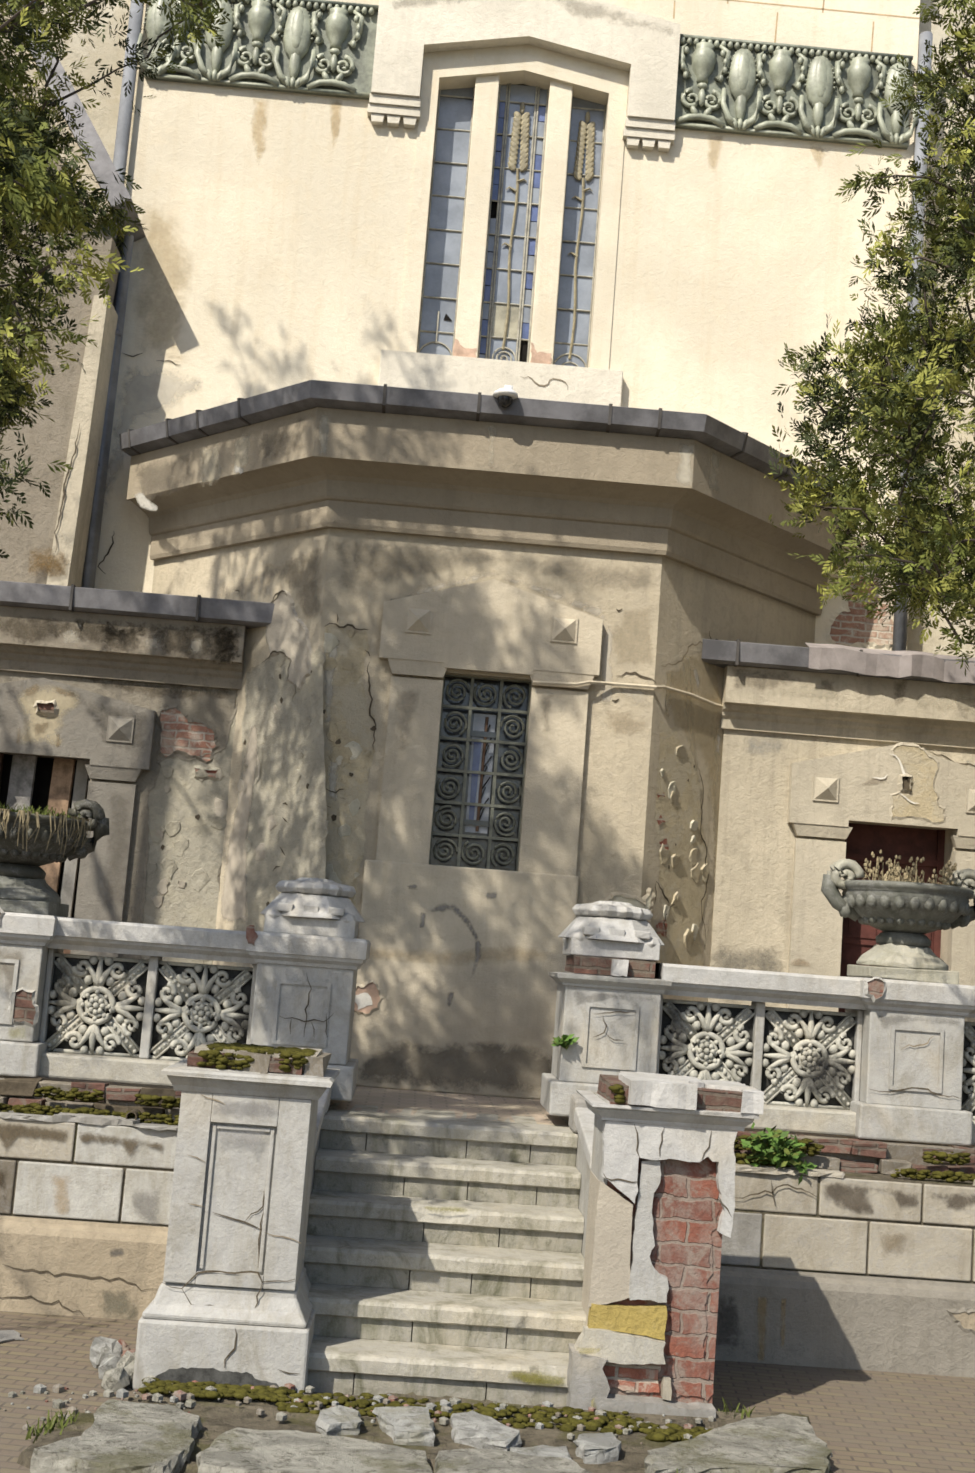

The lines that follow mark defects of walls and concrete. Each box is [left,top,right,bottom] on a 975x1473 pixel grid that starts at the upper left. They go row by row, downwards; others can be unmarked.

flaking render [825,573,893,650]
crack [324,614,376,750]
flaking render [139,590,376,968]
crack [280,973,334,1038]
leakage [363,1043,552,1089]
leakage [0,1124,162,1153]
crack [0,1195,300,1368]
flaking render [946,1307,975,1335]